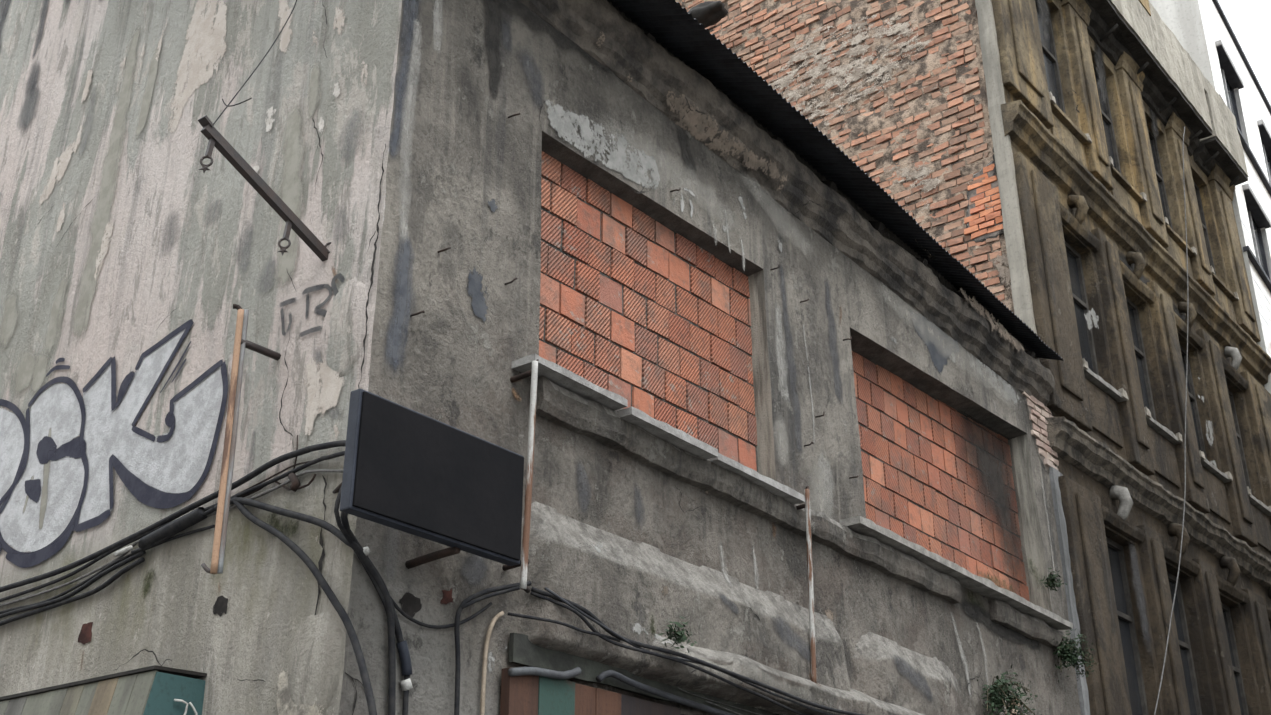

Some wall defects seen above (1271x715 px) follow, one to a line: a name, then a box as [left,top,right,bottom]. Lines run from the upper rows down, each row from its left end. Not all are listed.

water stain [0,0,11,37]
water stain [21,0,49,128]
peeling [168,0,228,132]
peeling [278,0,292,54]
water stain [484,0,541,104]
crack [312,115,323,191]
water stain [386,0,420,370]
spalling [664,90,788,193]
crack [358,144,386,388]
crack [274,325,294,451]
peeling [304,357,359,438]
crack [315,475,327,615]